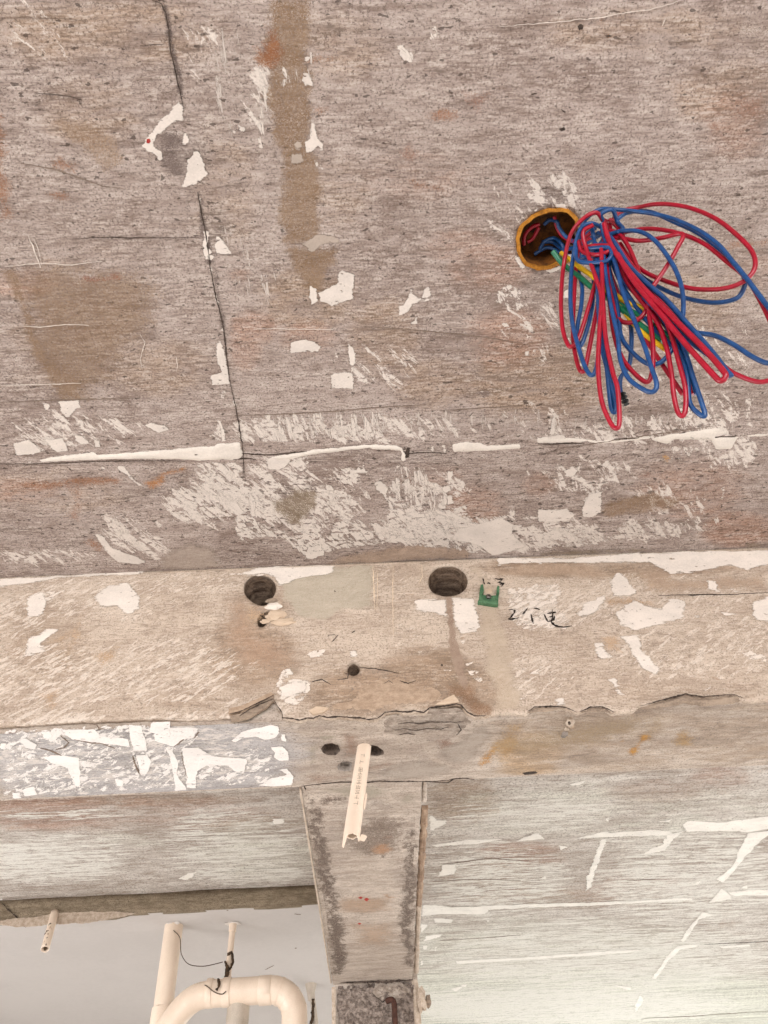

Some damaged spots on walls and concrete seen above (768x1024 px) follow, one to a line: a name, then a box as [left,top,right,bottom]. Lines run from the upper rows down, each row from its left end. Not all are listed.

crack [140,0,184,110]
water stain [260,0,341,297]
water stain [0,260,168,408]
crack [197,194,523,471]
peeling [266,456,309,470]
peeling [260,411,387,442]
peeling [172,461,768,674]
peeling [0,669,471,799]
crack [274,700,483,721]
water stain [444,596,494,719]
water stain [302,730,455,977]
peeling [420,815,768,979]